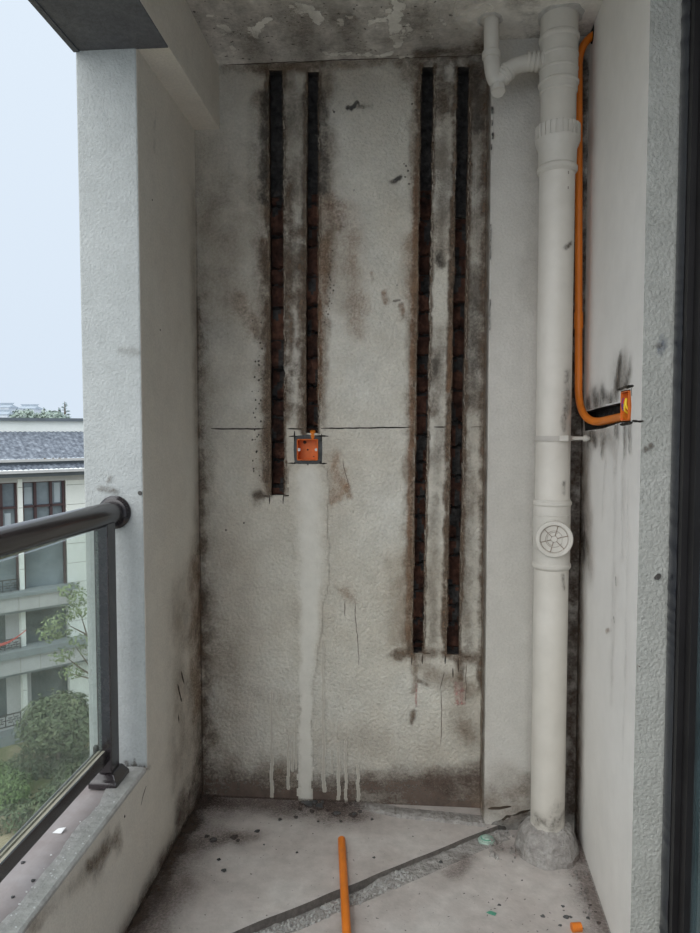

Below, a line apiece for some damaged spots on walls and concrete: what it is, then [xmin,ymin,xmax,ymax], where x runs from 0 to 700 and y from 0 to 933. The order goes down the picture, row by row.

peeling [247,16,273,39]
peeling [288,1,353,26]
peeling [322,0,415,59]
water stain [123,639,481,933]
water stain [574,844,609,933]